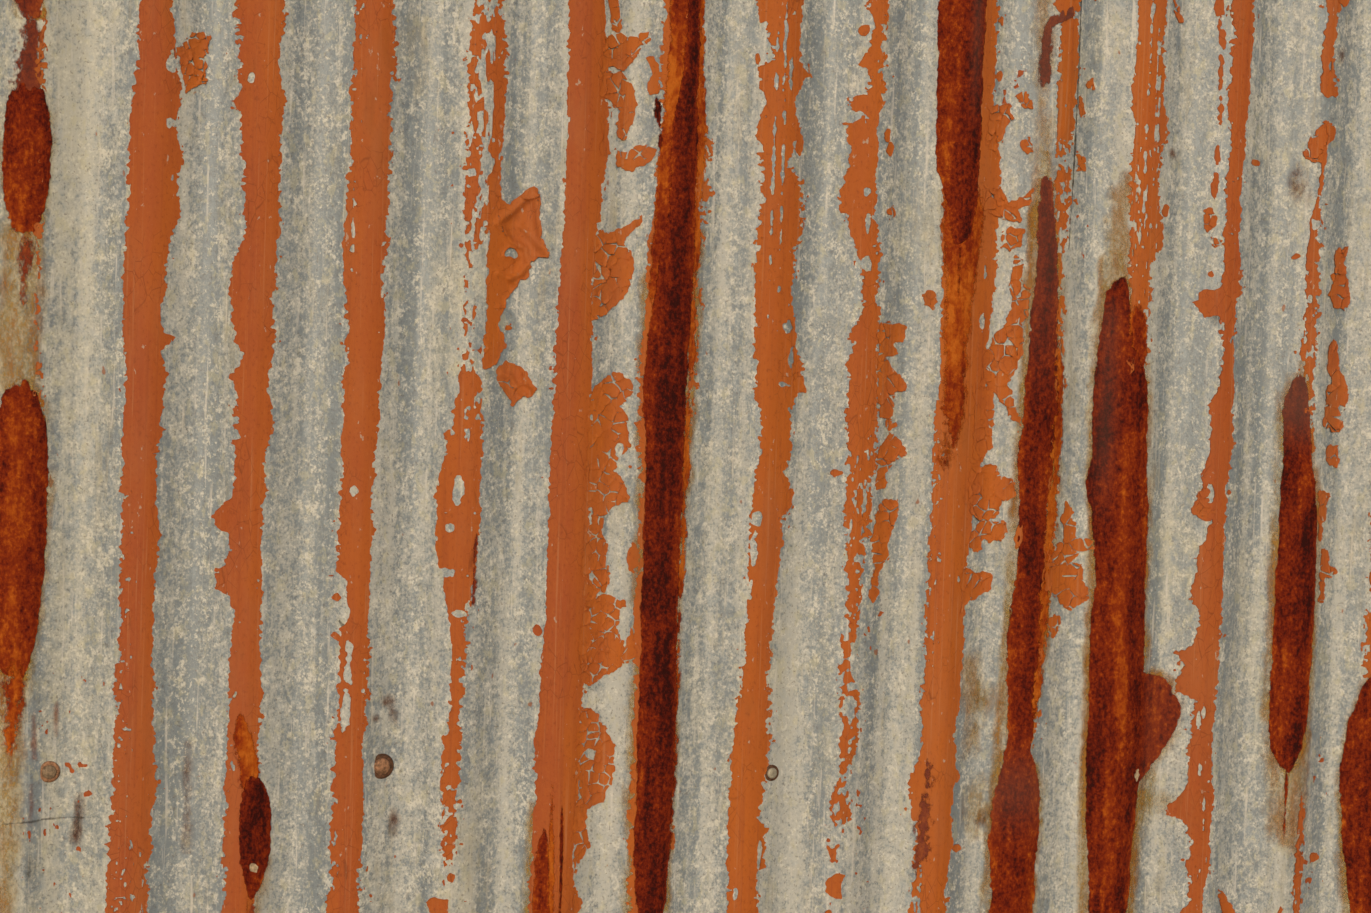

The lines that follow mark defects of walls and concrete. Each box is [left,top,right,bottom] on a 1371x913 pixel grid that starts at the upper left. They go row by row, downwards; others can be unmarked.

corrosion [0,0,52,913]
peeling [103,0,212,913]
peeling [211,0,289,913]
peeling [426,0,706,913]
corrosion [625,0,708,913]
peeling [829,0,907,827]
corrosion [935,0,987,470]
peeling [900,0,1096,913]
corrosion [966,176,1065,913]
corrosion [1079,176,1181,913]
peeling [1165,0,1260,913]
corrosion [1264,373,1320,846]